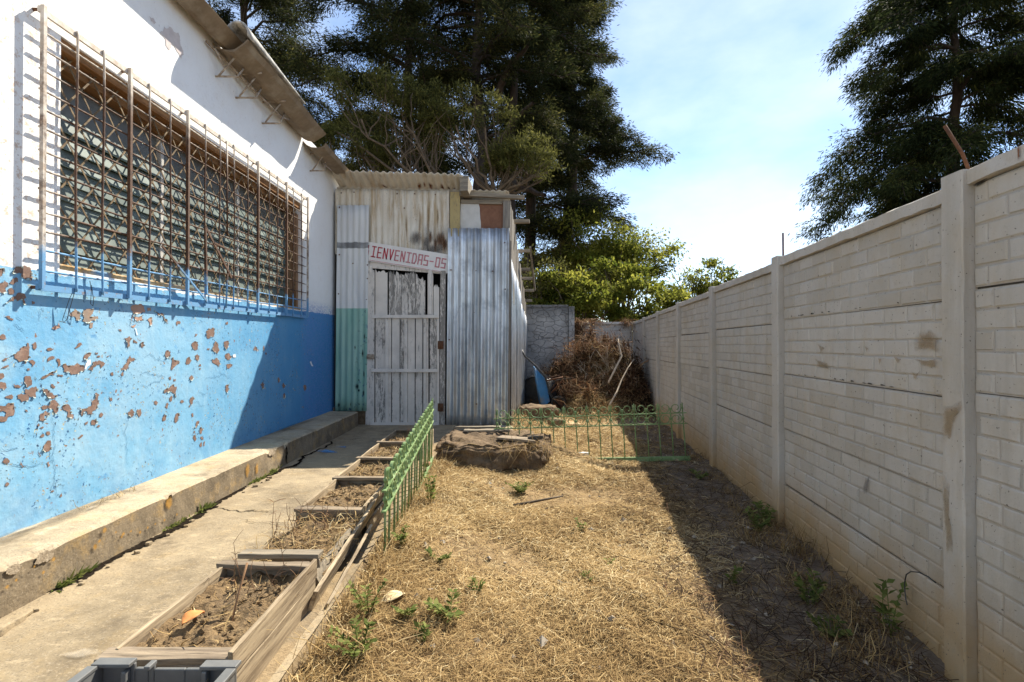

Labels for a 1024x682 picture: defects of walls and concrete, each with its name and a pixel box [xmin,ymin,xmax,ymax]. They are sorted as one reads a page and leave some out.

peeling [0,304,181,467]
peeling [154,321,232,447]
crack [48,441,333,592]